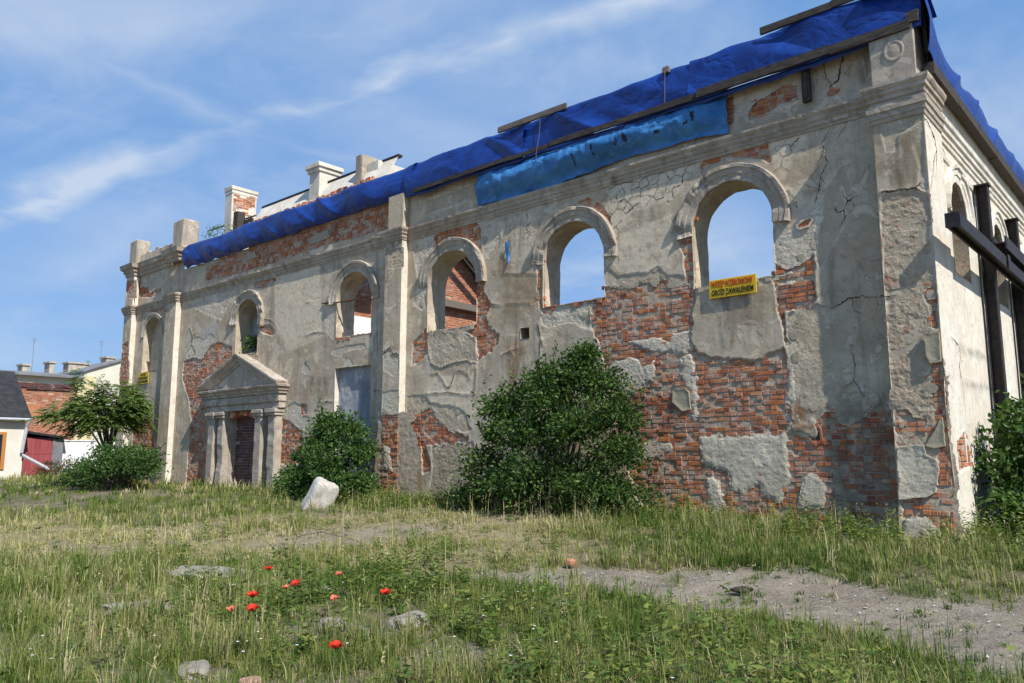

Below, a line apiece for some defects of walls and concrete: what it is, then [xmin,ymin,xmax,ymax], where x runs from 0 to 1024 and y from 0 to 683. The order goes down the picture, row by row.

flaking render [726,77,802,127]
crack [823,56,844,95]
flaking render [233,193,255,217]
flaking render [206,202,389,281]
flaking render [389,220,500,310]
flaking render [468,282,499,361]
flaking render [532,167,973,541]
crack [821,294,897,313]
crack [774,119,945,223]
flaking render [183,334,232,486]
flaking render [374,391,477,501]